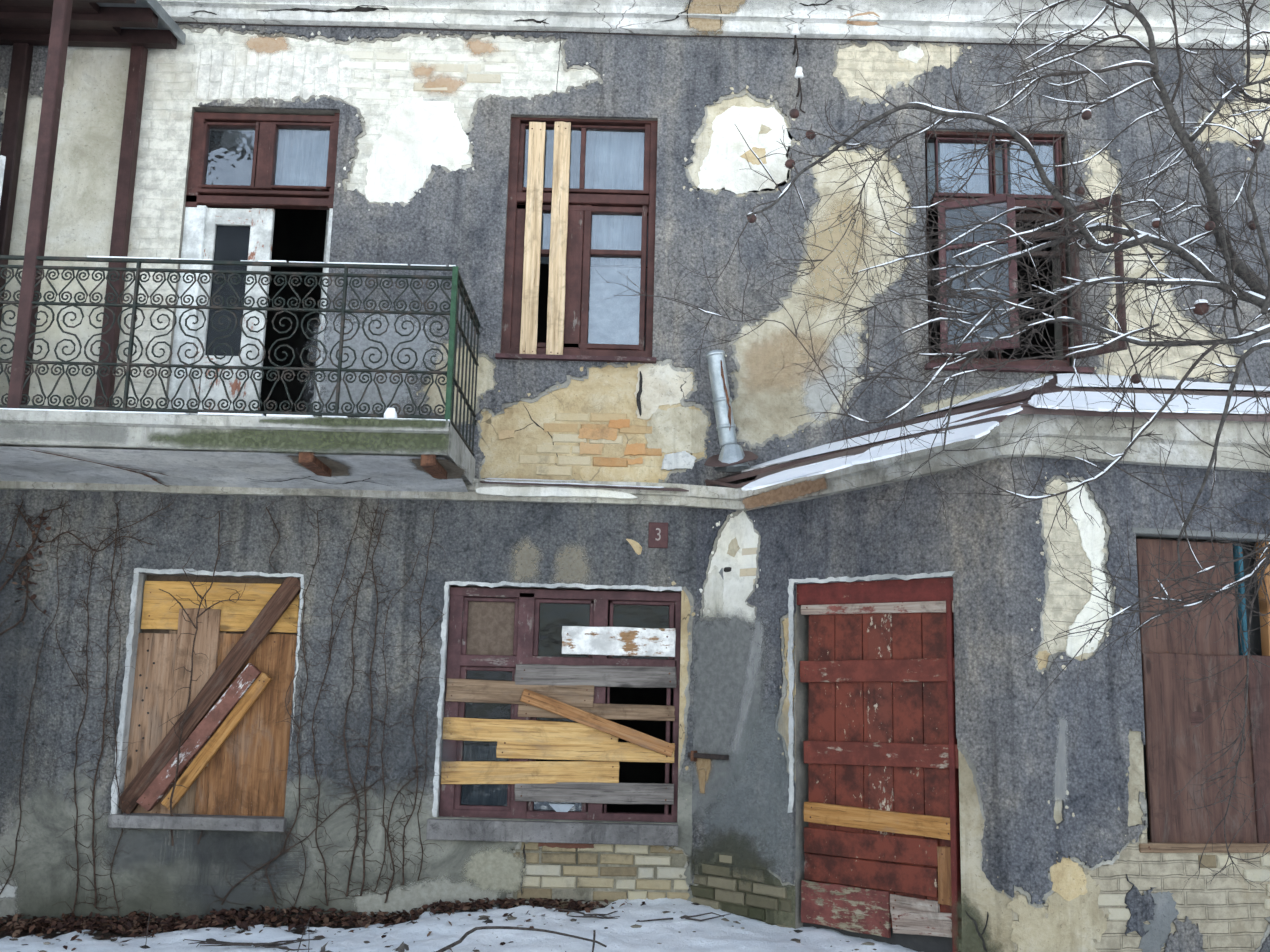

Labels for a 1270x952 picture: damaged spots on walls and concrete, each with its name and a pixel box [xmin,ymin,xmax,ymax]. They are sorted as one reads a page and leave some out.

crack [655,0,722,27]
crack [799,0,833,8]
flaking render [831,41,972,107]
flaking render [0,87,43,404]
flaking render [28,46,131,407]
flaking render [112,24,604,412]
flaking render [683,85,919,450]
flaking render [411,339,711,499]
flaking render [671,510,761,800]
flaking render [1031,471,1124,674]
flaking render [355,842,796,929]
flaking render [954,719,1270,952]